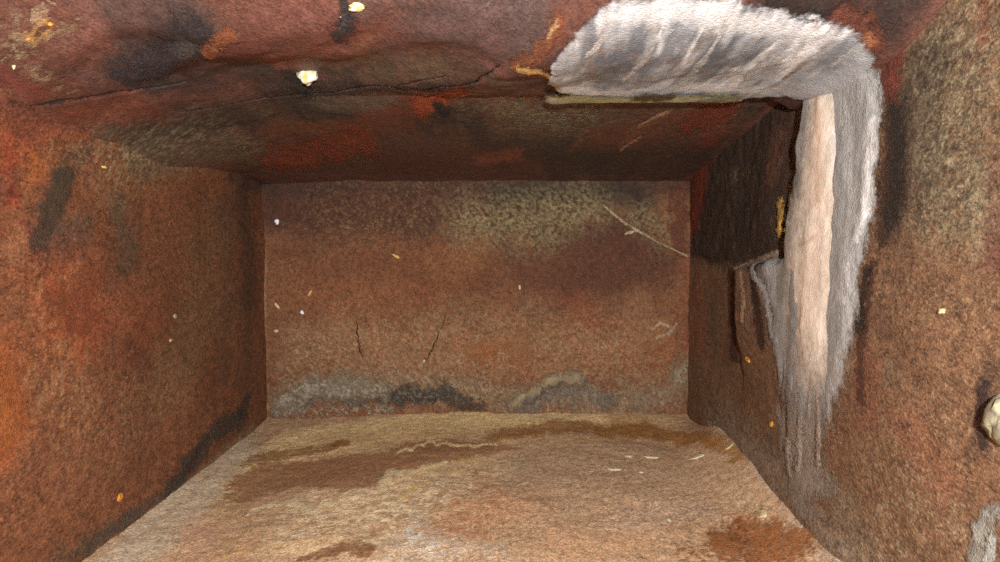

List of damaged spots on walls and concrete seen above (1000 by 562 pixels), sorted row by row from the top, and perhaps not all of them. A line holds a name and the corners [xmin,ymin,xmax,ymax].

water stain [111,8,238,86]
corrosion [510,13,562,79]
crack [38,84,167,105]
crack [184,65,500,111]
corrosion [410,89,467,116]
spalling [690,104,797,363]
crack [428,314,446,359]
water stain [271,370,486,419]
water stain [78,395,251,558]
water stain [194,418,599,562]
corrosion [670,512,835,562]